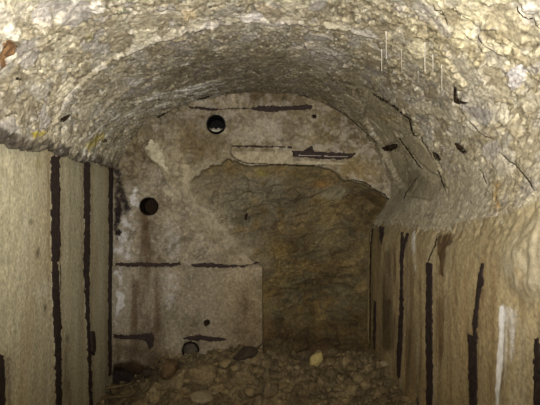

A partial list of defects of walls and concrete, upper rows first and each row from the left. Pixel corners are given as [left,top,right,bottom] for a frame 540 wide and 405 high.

corrosion [0,40,18,69]
crack [230,147,330,166]
crack [372,92,447,198]
damp [495,304,520,405]